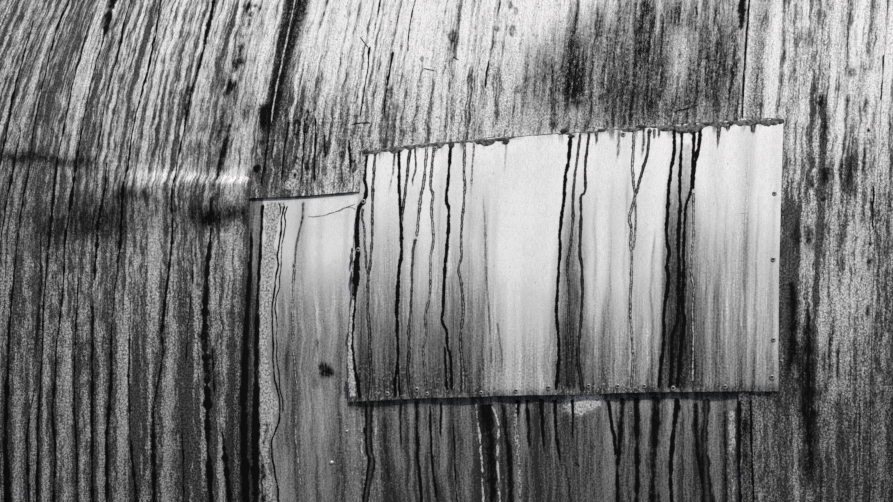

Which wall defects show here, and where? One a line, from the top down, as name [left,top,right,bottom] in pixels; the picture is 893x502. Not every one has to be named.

leakage [522,0,750,127]
rust [476,132,598,502]
rust [607,123,702,502]
rust [694,399,714,502]